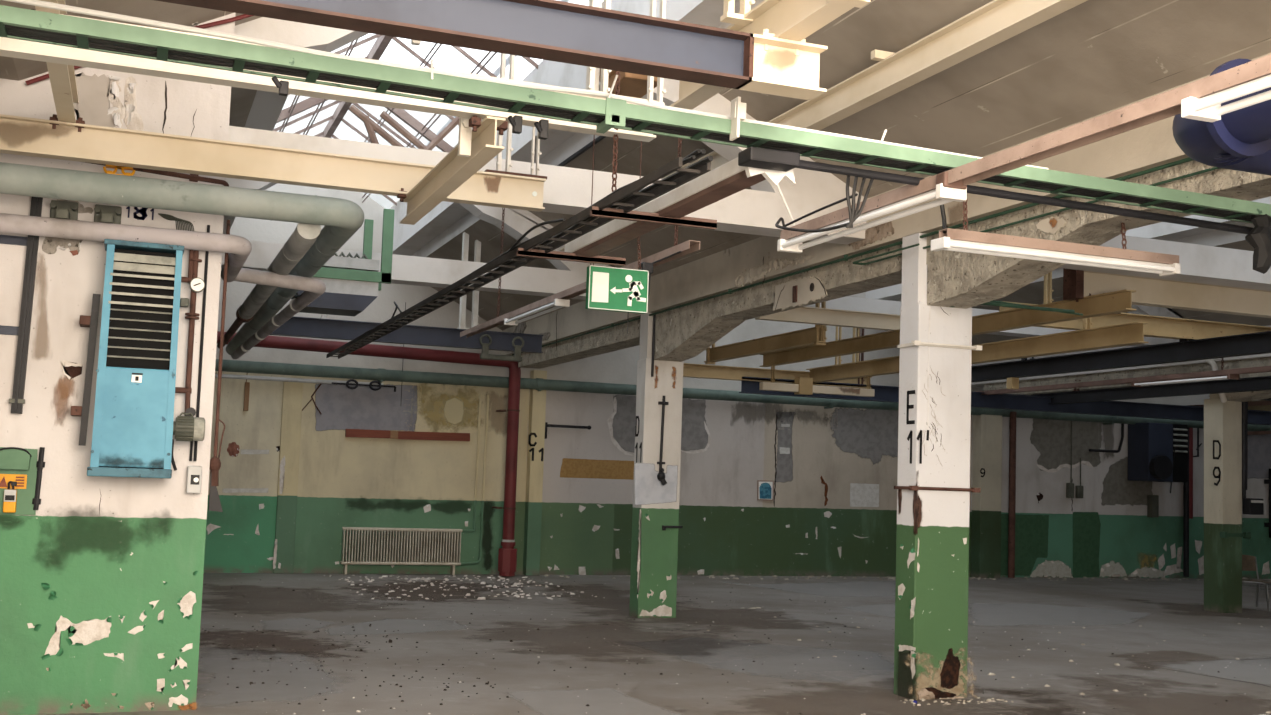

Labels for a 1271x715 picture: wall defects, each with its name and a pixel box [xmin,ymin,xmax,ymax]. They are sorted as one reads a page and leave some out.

flaking render [73,72,144,131]
corrosion [898,472,922,535]
peeling [41,583,58,601]
peeling [637,509,672,616]
peeling [898,583,916,619]
peeling [900,538,920,572]
peeling [1030,560,1073,578]
peeling [27,591,196,671]
peeling [145,643,192,710]
peeling [898,645,963,700]
corrosion [925,648,961,699]